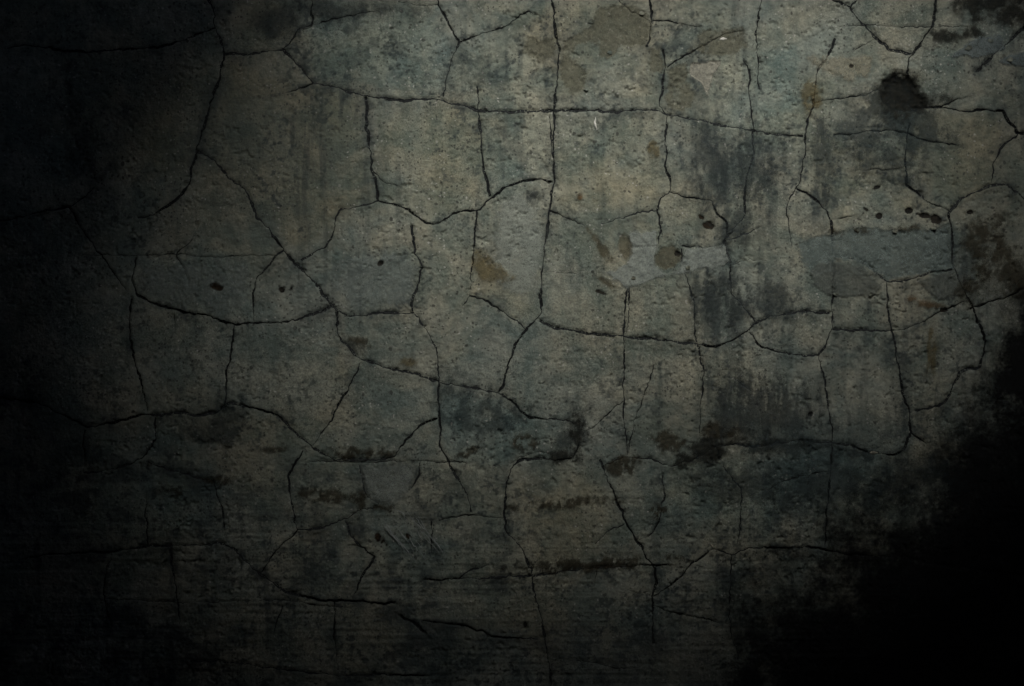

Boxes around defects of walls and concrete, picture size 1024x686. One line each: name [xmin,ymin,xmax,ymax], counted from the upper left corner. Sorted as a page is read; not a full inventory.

damp [878,70,953,119]
crack [0,0,1024,544]
damp [955,214,1024,307]
damp [652,420,743,468]
crack [29,450,395,646]
crack [400,615,537,640]
crack [424,452,580,686]
crack [595,456,784,651]